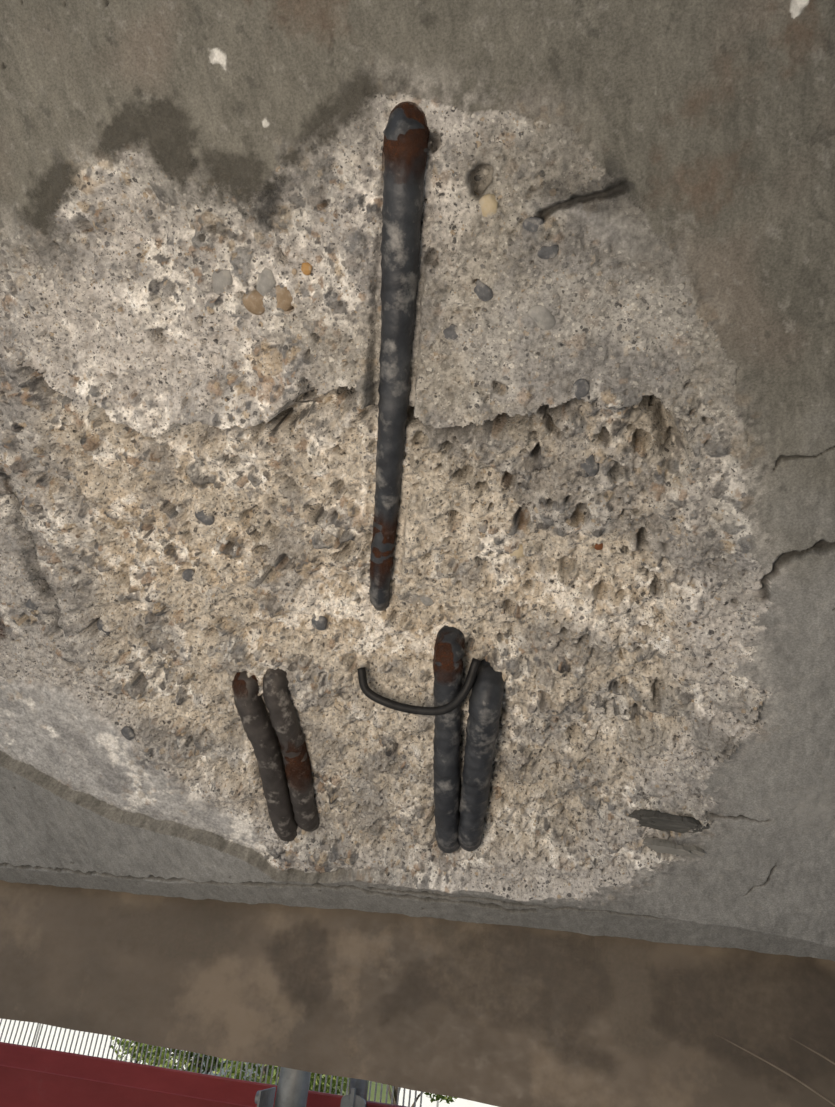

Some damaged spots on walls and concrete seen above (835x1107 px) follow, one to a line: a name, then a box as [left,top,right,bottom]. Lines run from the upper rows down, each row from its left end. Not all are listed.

leakage [96,90,281,214]
leakage [281,70,379,164]
corrosion [382,101,430,169]
leakage [24,163,77,236]
crack [533,176,634,224]
crack [774,446,835,470]
spalling [0,91,773,901]
corrosion [370,515,398,579]
crack [752,538,835,604]
corrosion [232,672,258,693]
corrosion [433,637,465,682]
corrosion [278,730,312,787]